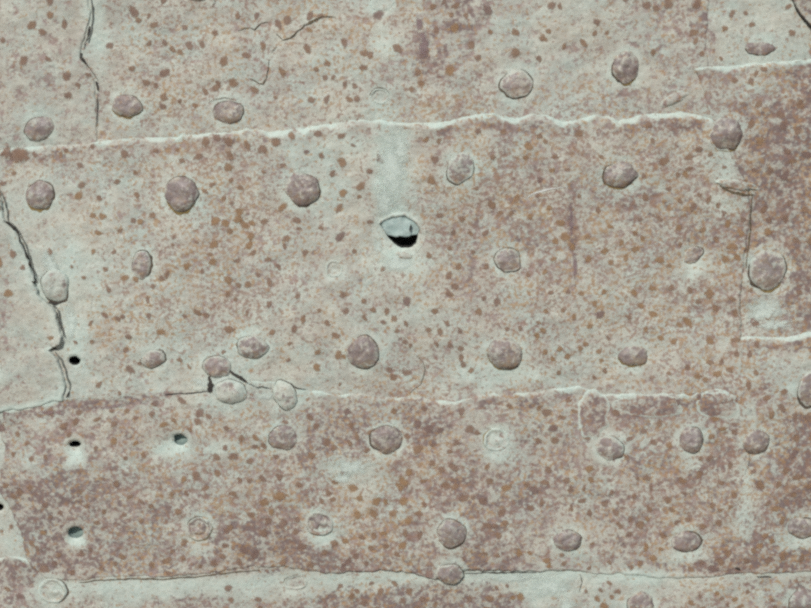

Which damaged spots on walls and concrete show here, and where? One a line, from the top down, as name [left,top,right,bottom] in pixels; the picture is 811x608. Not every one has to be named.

crack [79,0,99,122]
rust [142,69,197,109]
rust [175,135,243,190]
crack [0,191,38,283]
rust [211,196,281,270]
crack [48,301,71,397]
rust [426,309,474,373]
rust [213,435,278,476]
rust [237,474,307,549]
rust [310,468,426,571]
crack [79,570,259,583]
crack [465,569,536,577]